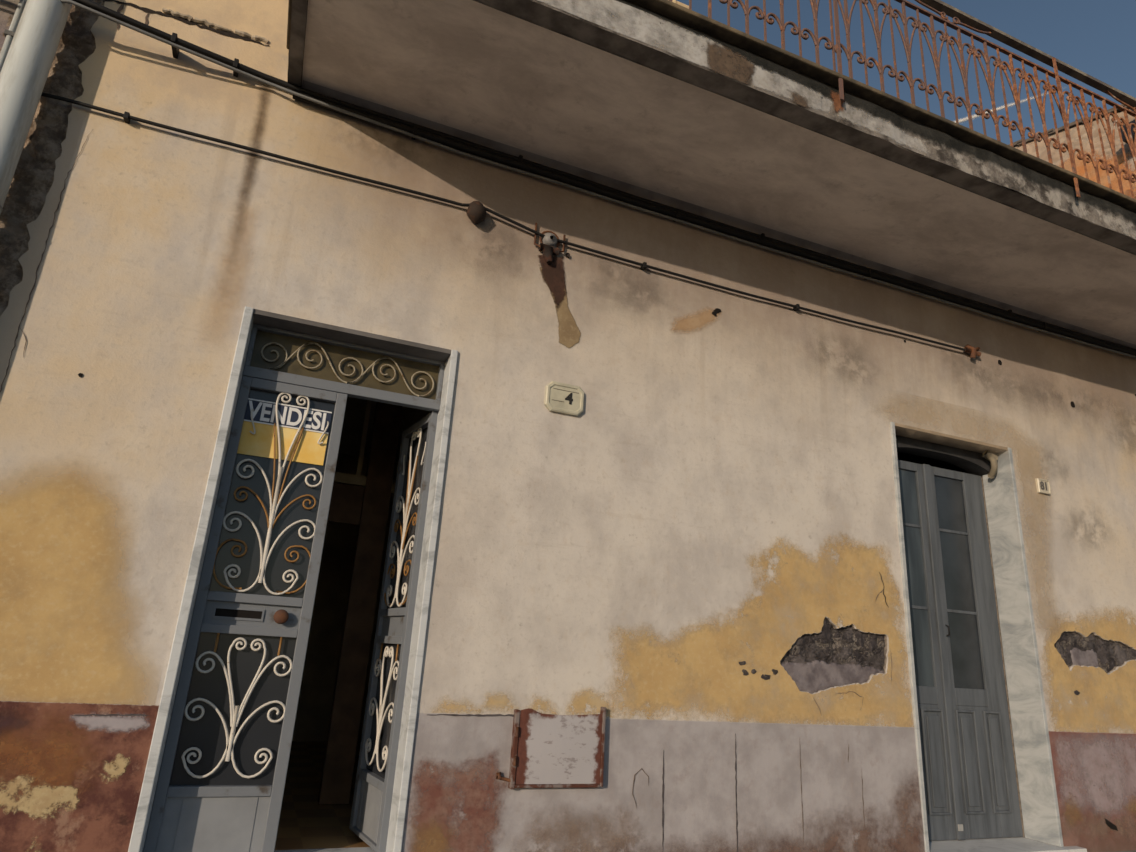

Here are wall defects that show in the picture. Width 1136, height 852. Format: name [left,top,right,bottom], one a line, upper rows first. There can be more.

crack [103,0,269,46]
water stain [243,84,267,194]
peeling [537,0,927,154]
peeling [0,474,144,705]
peeling [569,536,913,727]
peeling [1045,611,1136,831]
water stain [768,784,924,852]